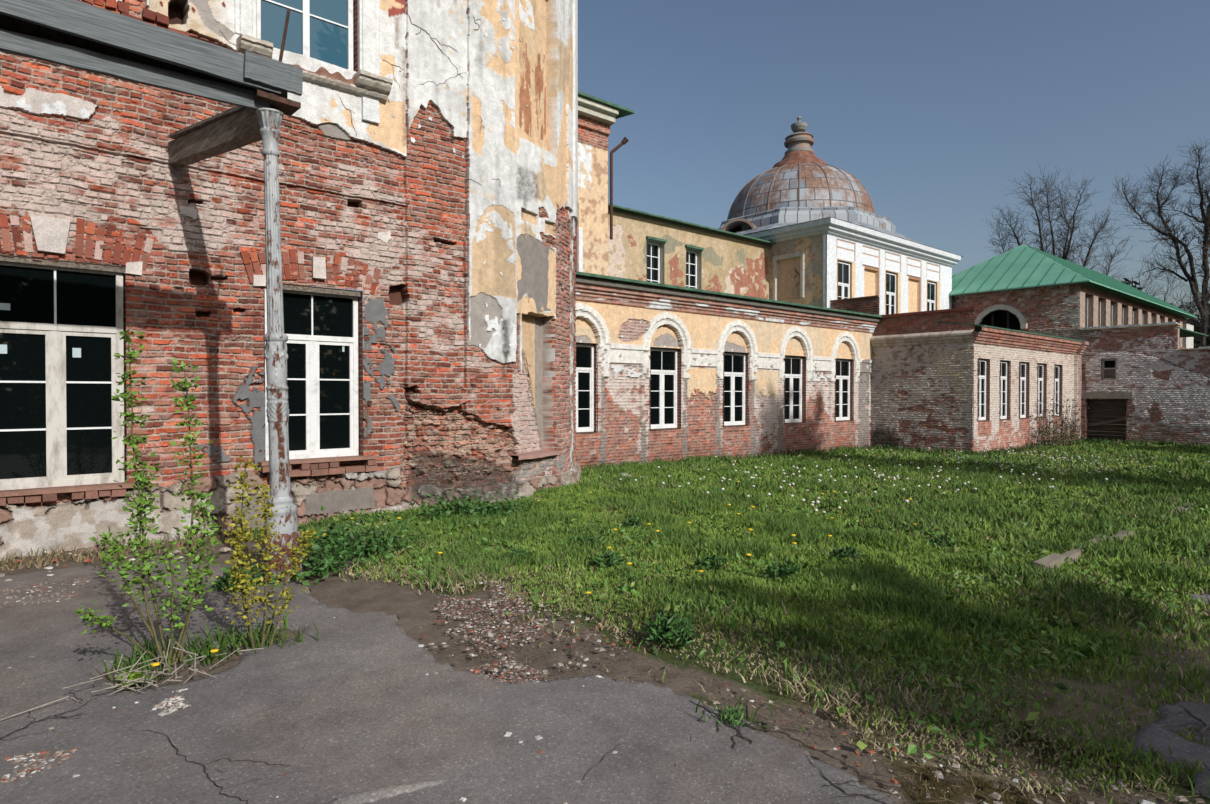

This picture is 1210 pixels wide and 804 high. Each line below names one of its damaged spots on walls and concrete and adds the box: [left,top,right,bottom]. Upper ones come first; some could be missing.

spalling [77,0,196,36]
crack [383,3,481,88]
flaking render [318,0,594,475]
flaking render [617,318,683,348]
flaking render [724,340,746,353]
flaking render [1091,327,1176,351]
flaking render [1150,369,1173,380]
flaking render [603,380,642,465]
flaking render [685,383,721,459]
flaking render [1147,403,1164,422]
spalling [399,385,528,503]